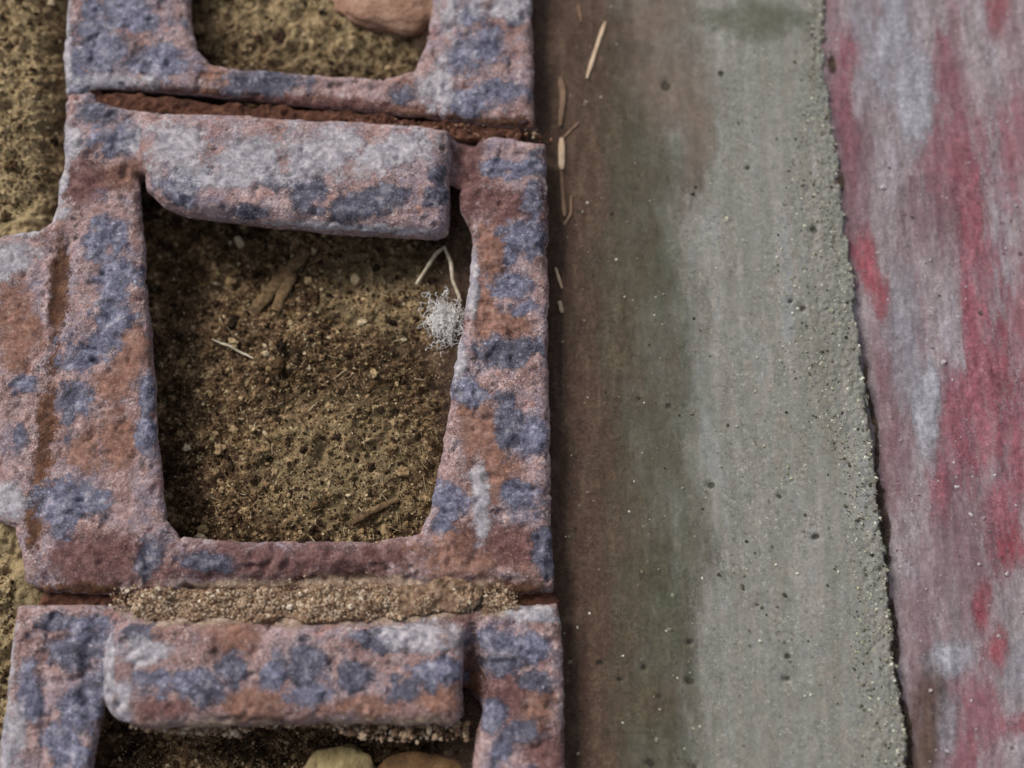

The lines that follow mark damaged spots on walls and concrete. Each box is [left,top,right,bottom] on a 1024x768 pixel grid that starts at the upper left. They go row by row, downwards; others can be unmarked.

rust [0,0,686,768]